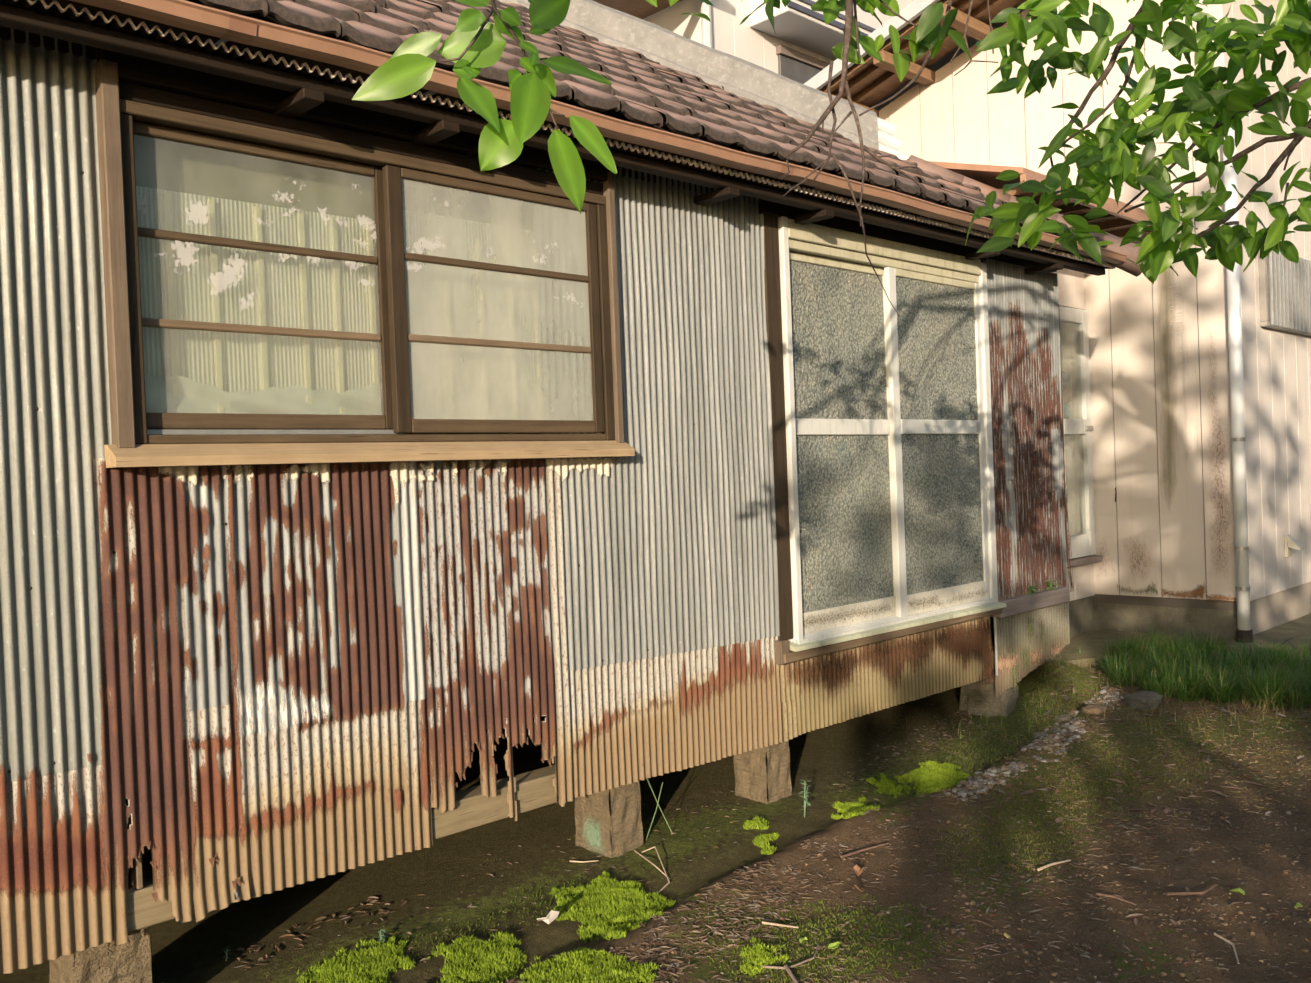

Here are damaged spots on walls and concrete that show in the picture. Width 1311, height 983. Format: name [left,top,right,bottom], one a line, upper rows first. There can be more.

rust [989,299,1074,600]
rust [0,461,404,900]
rust [417,458,558,810]
peeling [455,736,552,787]
rust [573,621,992,750]